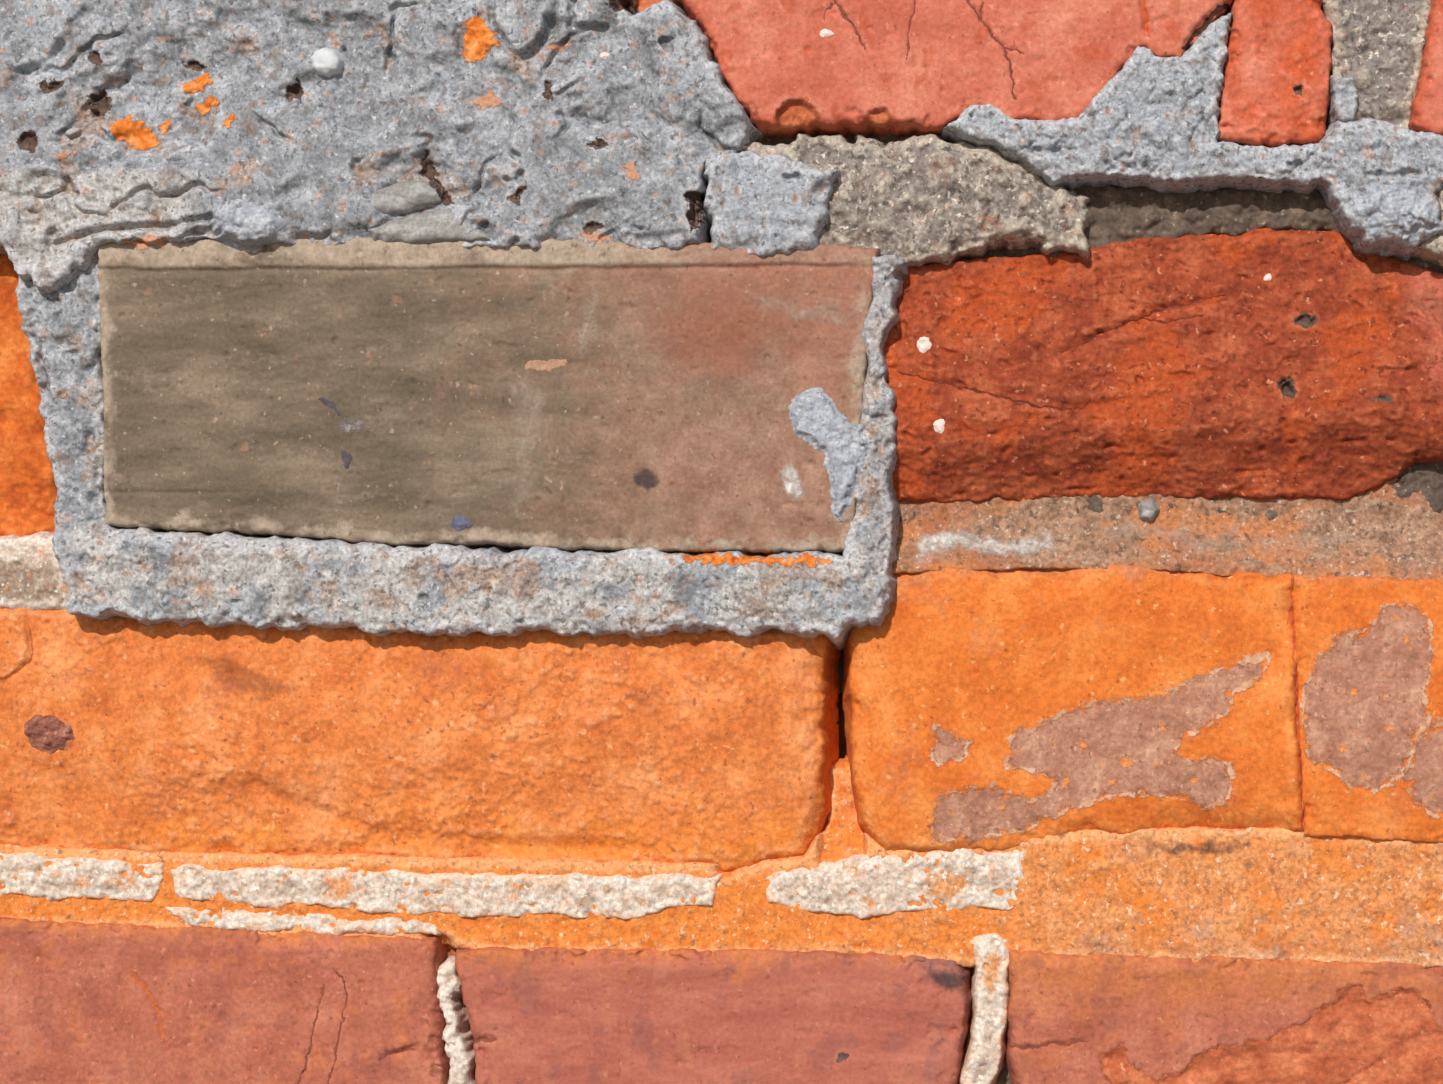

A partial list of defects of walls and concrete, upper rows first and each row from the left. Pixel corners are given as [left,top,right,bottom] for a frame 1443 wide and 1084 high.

crack [823,0,866,50]
crack [906,0,916,60]
crack [966,0,1024,100]
crack [0,625,34,683]
peeling [928,651,1273,845]
peeling [1296,602,1443,819]
crack [297,965,348,1084]
spalling [1100,984,1443,1084]